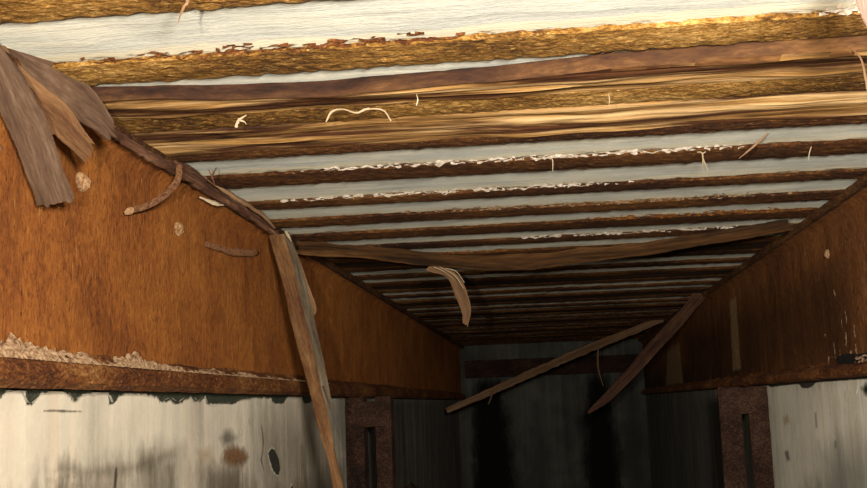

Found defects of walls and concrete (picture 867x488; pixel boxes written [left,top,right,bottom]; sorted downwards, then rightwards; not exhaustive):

corrosion [224,446,247,465]